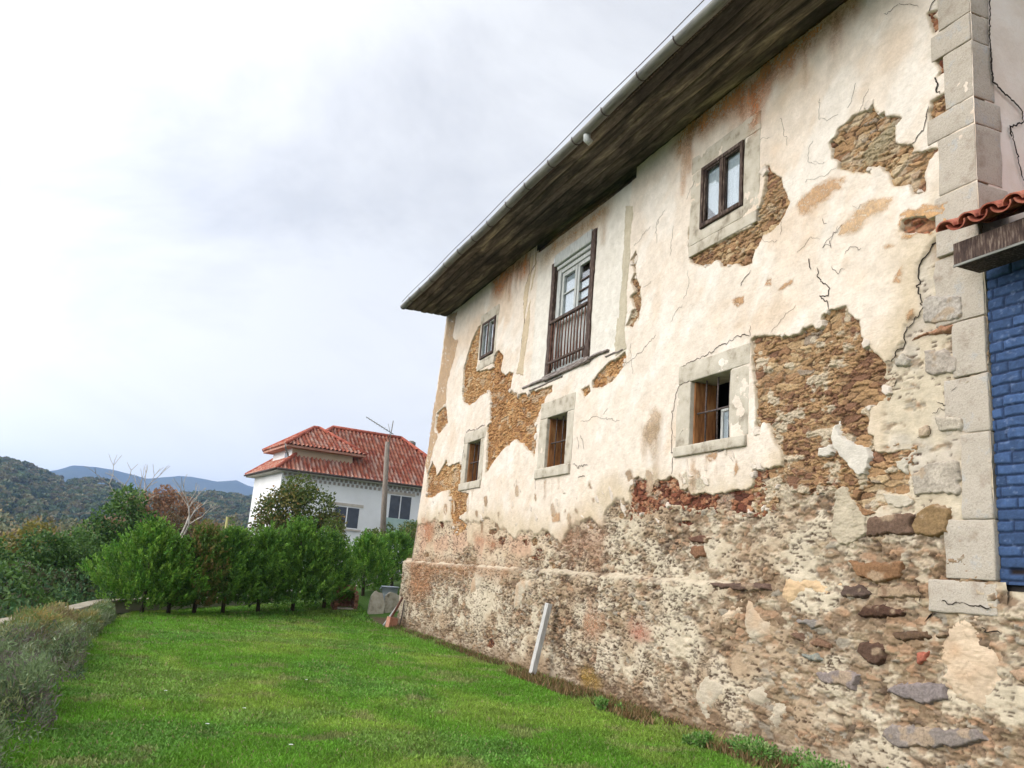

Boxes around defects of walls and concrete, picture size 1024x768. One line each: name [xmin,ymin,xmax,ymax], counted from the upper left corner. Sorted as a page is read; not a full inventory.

crack [989,0,1024,180]
spalling [686,99,946,268]
spalling [425,312,552,546]
spalling [582,353,626,397]
spalling [628,254,642,327]
crack [671,305,796,474]
spalling [589,307,964,559]
crack [757,206,861,309]
crack [885,242,936,362]
flaking render [907,296,963,341]
peeling [523,488,593,569]